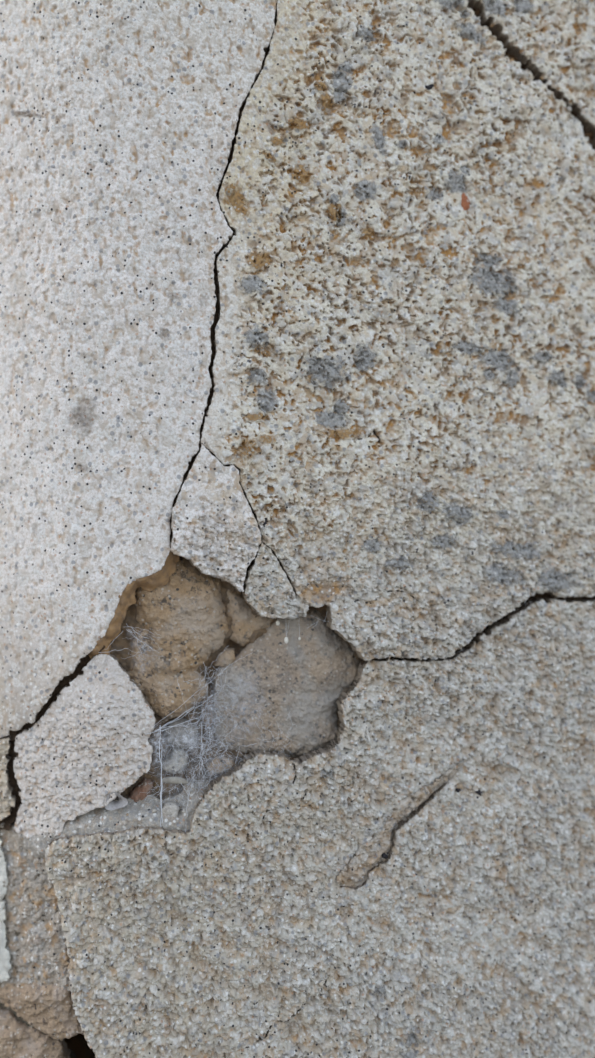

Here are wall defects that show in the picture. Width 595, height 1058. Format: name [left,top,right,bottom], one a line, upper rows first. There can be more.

crack [467,6,535,81]
crack [570,110,594,149]
crack [170,11,294,591]
spalling [296,581,349,622]
crack [457,592,595,650]
crack [360,657,425,666]
crack [0,646,105,831]
flaking render [0,444,277,991]
spalling [0,1002,50,1038]